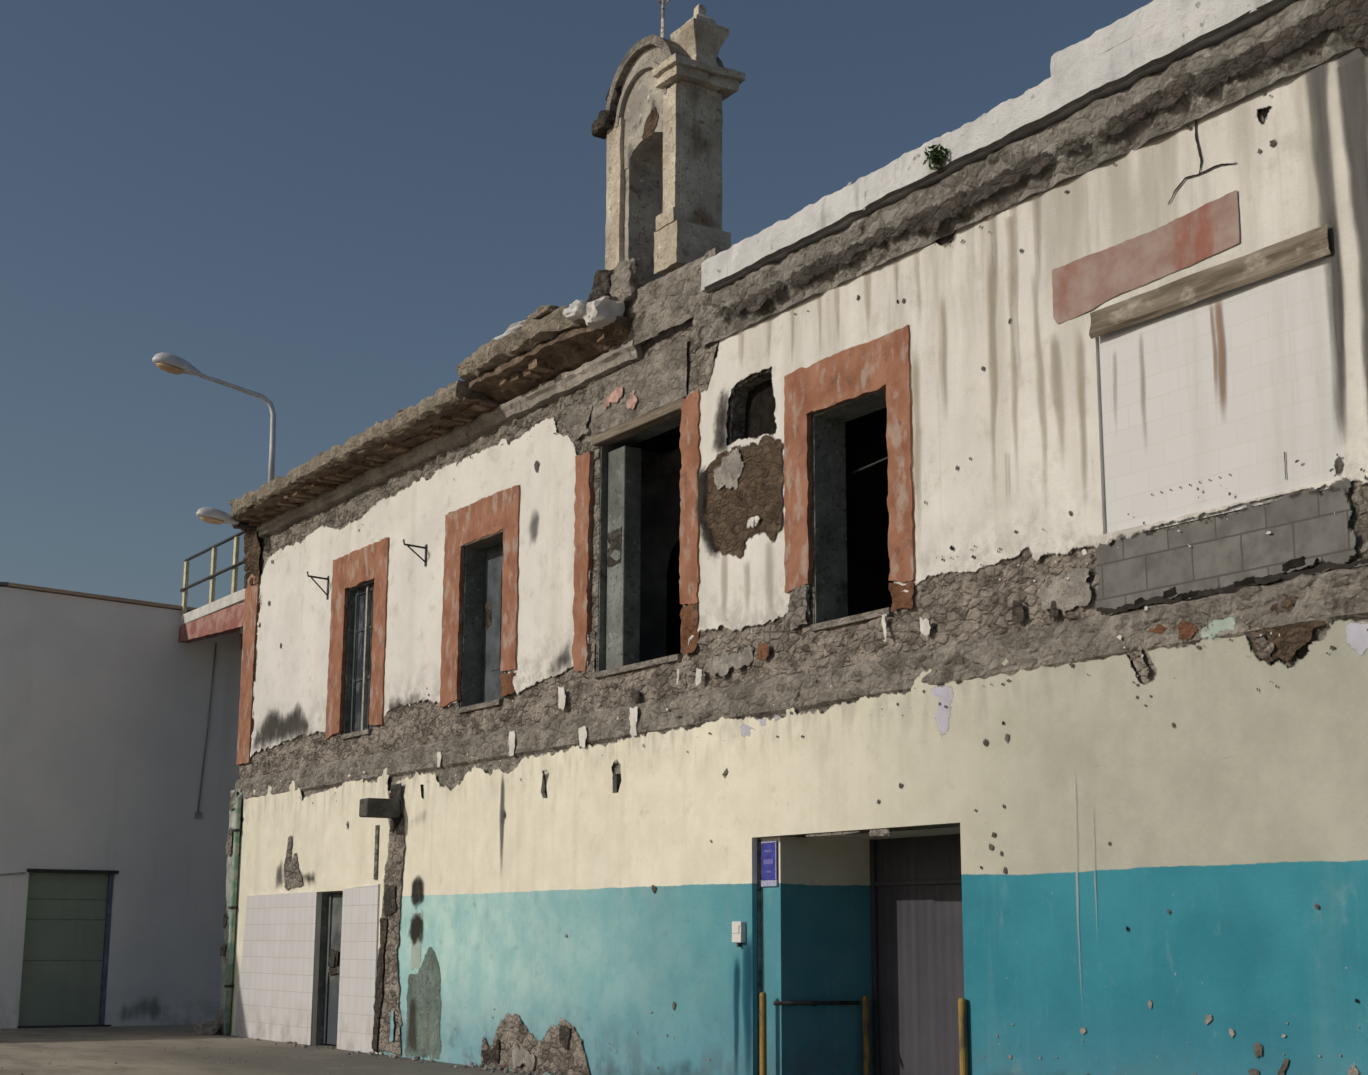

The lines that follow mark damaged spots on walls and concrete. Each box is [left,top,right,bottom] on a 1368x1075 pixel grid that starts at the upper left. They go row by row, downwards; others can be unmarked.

crack [704,0,1284,291]
spalling [714,0,1368,319]
damp [1306,47,1368,427]
flaking render [1329,454,1368,567]
flaking render [229,526,1102,811]
spalling [1117,597,1368,707]
damp [254,706,308,747]
spalling [283,835,303,890]
spalling [371,782,454,1060]
spalling [479,1008,612,1075]
flaking render [1248,1042,1262,1075]
flaking render [1277,1022,1289,1075]